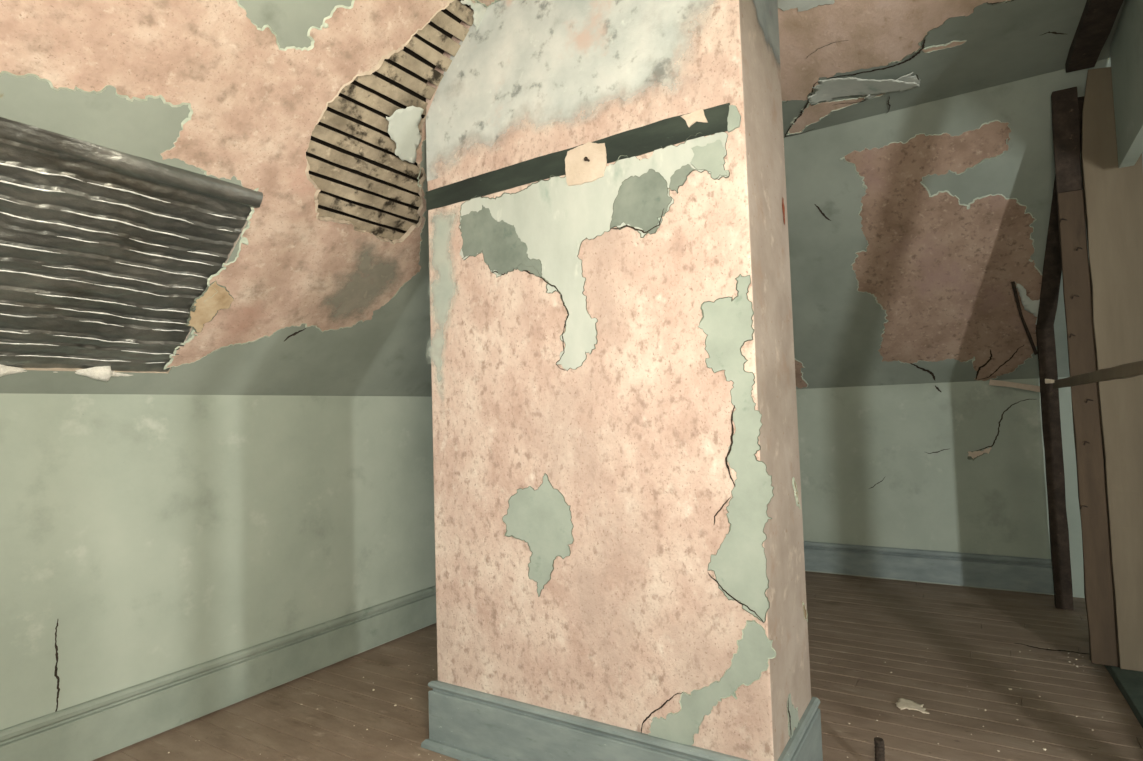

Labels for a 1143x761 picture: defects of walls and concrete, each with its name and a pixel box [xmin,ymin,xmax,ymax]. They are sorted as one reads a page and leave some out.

peeling [753,0,1012,135]
peeling [0,0,730,381]
peeling [839,120,1042,381]
crack [714,405,735,524]
peeling [795,358,808,389]
crack [980,399,1035,450]
crack [708,573,763,621]
crack [53,620,61,712]